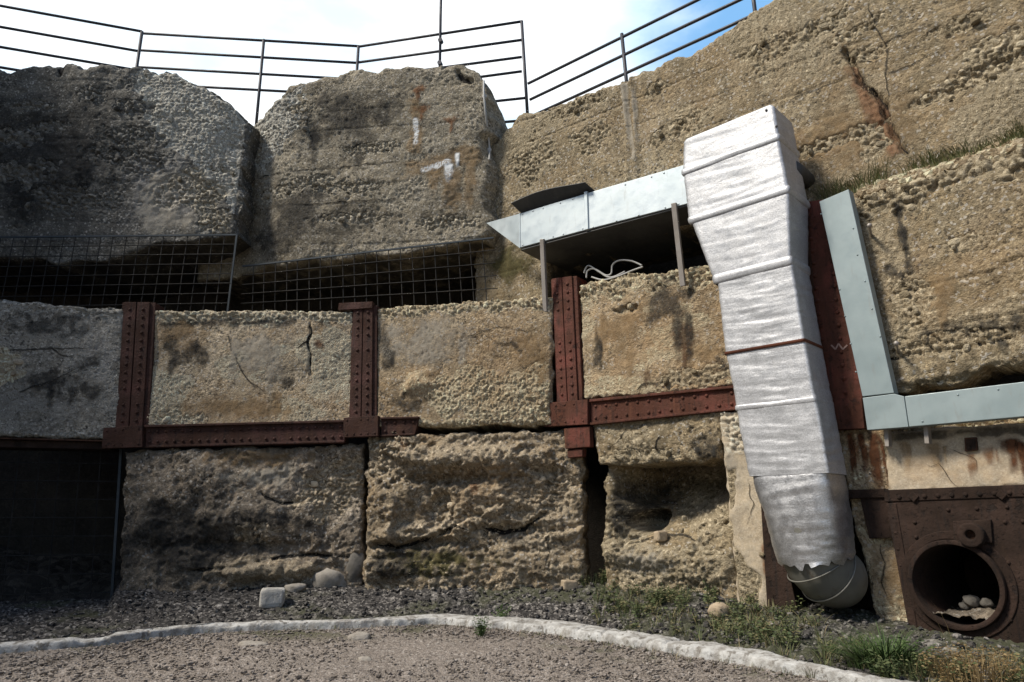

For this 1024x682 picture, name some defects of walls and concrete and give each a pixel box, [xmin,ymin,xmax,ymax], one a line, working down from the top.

crack [792,2,936,154]
rust [851,67,901,154]
water stain [31,357,100,405]
water stain [162,318,294,374]
crack [227,334,271,395]
crack [298,324,312,375]
water stain [648,280,693,354]
rust [847,433,888,482]